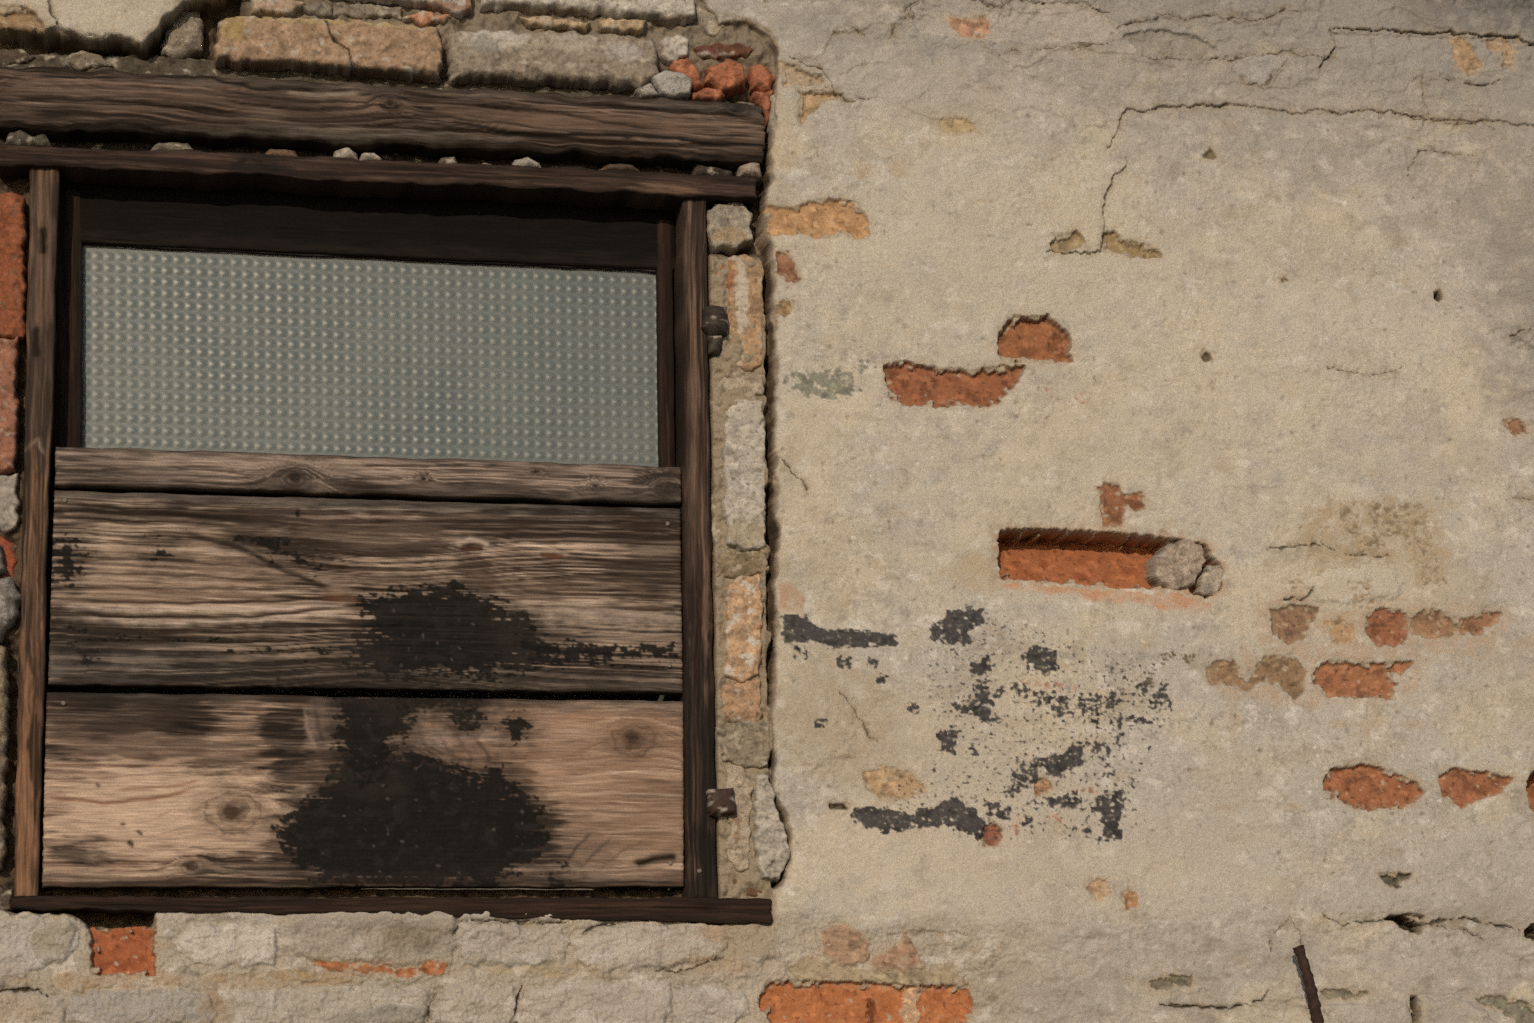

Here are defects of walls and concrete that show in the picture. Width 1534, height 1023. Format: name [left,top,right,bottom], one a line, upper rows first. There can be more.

crack [836,0,922,41]
crack [791,57,875,103]
crack [971,0,1534,256]
flaking render [0,0,1079,929]
flaking render [850,479,1506,847]
flaking render [1321,762,1534,928]
flaking render [0,888,682,983]
flaking render [755,921,979,1023]
crack [1160,913,1524,1010]